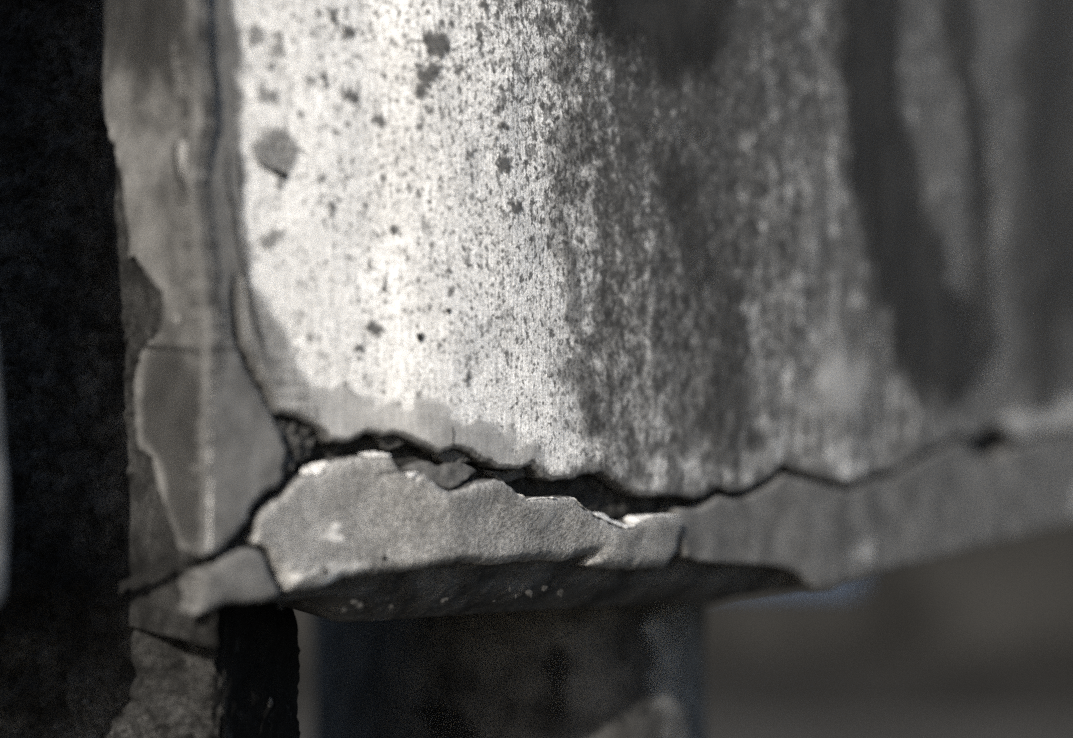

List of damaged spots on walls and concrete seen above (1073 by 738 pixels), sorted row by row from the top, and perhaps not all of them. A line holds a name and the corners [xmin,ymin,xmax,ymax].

crack [113,415,884,599]
crack [946,430,1073,459]